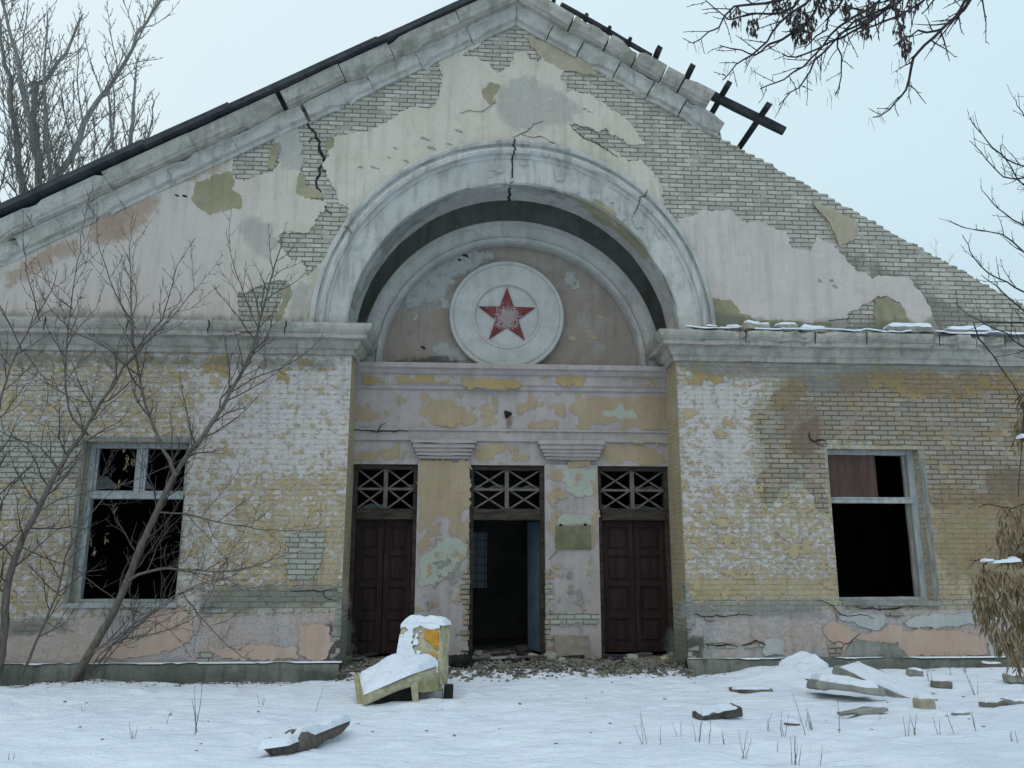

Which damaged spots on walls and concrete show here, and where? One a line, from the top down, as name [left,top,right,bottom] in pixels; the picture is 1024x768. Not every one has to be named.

flaking render [175,140,282,215]
crack [307,123,353,234]
flaking render [278,62,443,276]
crack [507,121,618,201]
flaking render [463,26,1024,337]
flaking render [706,298,832,344]
crack [354,423,405,433]
peeling [182,410,530,662]
peeling [344,375,741,650]
flaking render [682,361,1024,658]
crack [694,613,766,647]
crack [823,601,916,649]